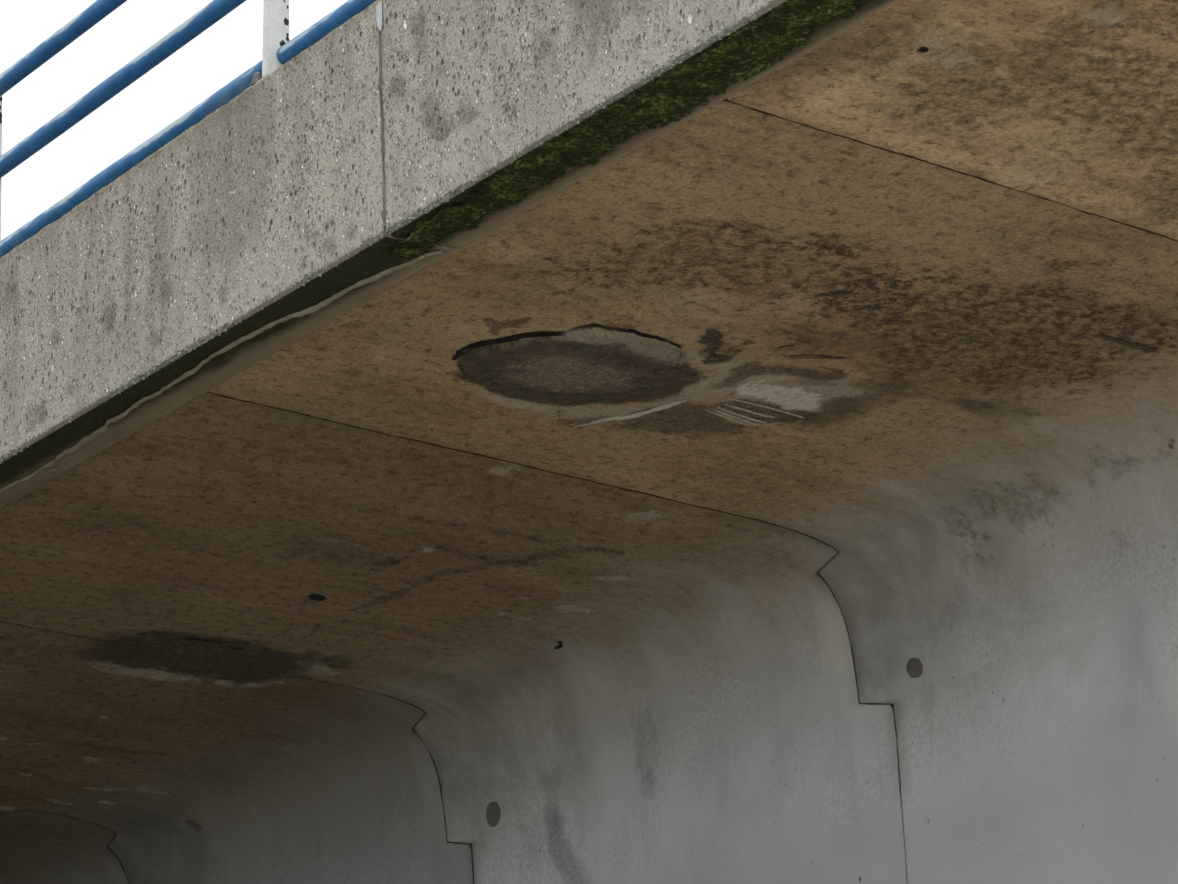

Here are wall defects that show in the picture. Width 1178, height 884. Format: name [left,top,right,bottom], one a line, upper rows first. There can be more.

leakage [542,220,1176,422]
peeling [451,323,750,439]
leakage [80,631,350,686]